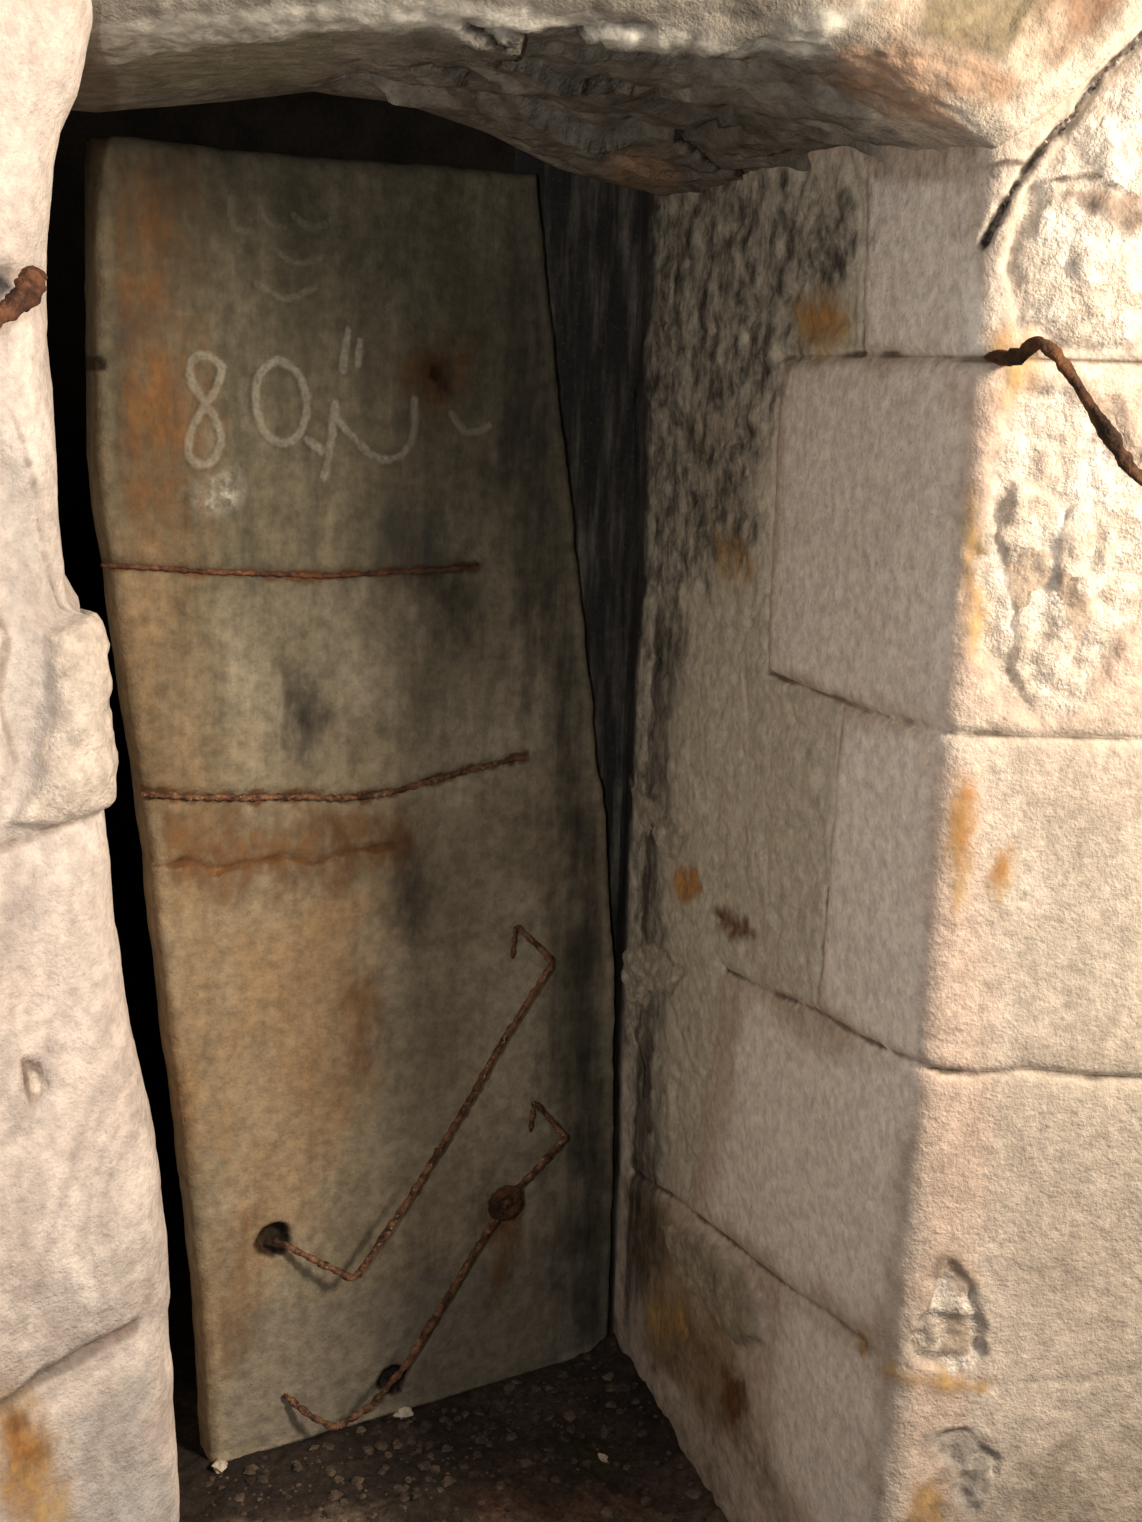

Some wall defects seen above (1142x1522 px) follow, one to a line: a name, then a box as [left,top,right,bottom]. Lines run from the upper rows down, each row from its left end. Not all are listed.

crack [981,31,1142,249]
corrosion [995,335,1027,387]
corrosion [140,786,264,805]